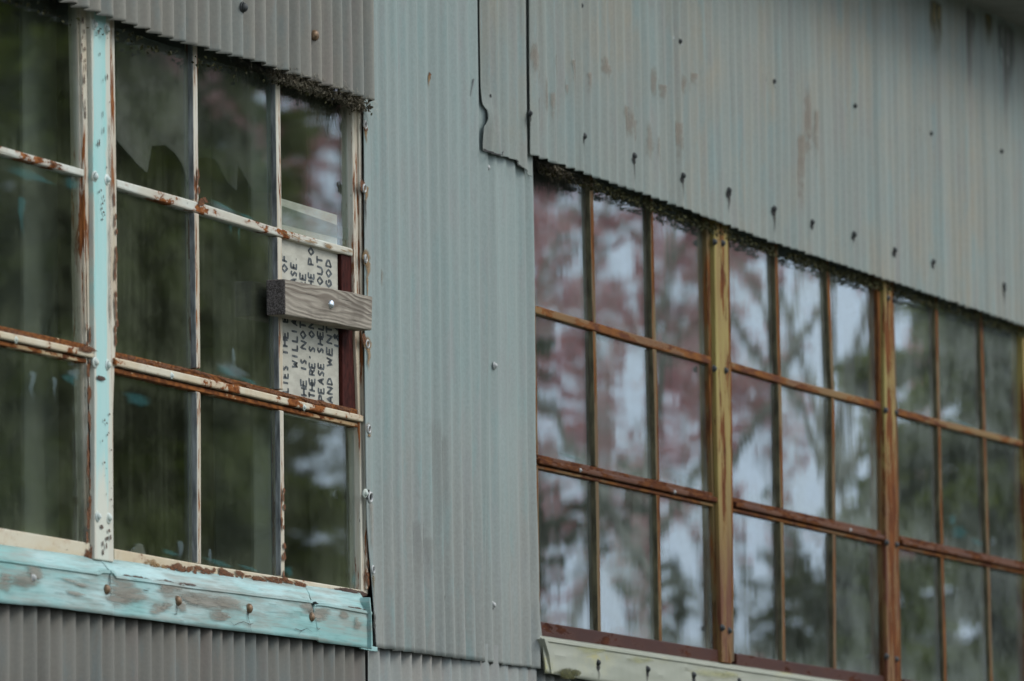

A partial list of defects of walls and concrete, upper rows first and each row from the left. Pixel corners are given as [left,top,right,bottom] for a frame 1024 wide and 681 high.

rust [113,191,352,411]
peeling [0,566,42,590]
peeling [107,574,241,620]